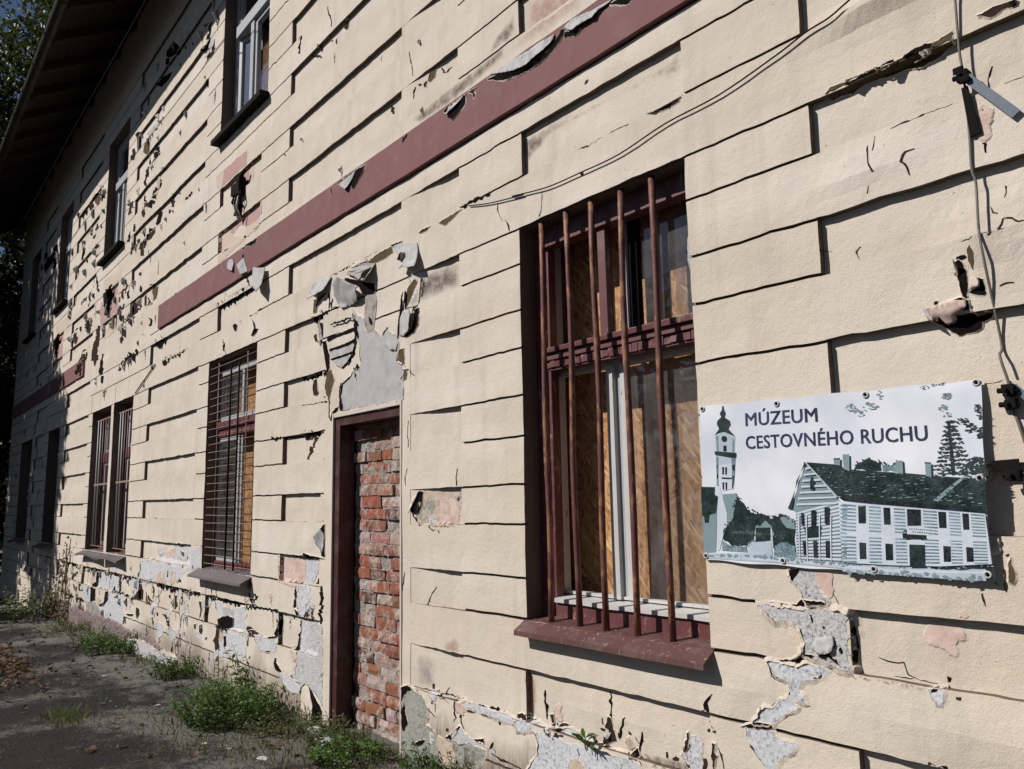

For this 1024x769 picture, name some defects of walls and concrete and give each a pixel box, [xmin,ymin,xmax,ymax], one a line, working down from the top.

crack [866,103,953,193]
peeling [975,102,995,152]
peeling [67,187,200,370]
flaking render [301,193,490,421]
flaking render [923,296,995,337]
peeling [408,488,462,533]
spalling [64,524,326,724]
spalling [740,566,865,769]
crack [878,657,938,684]
peeling [923,610,969,658]
spalling [400,668,645,769]
peeling [666,721,724,769]